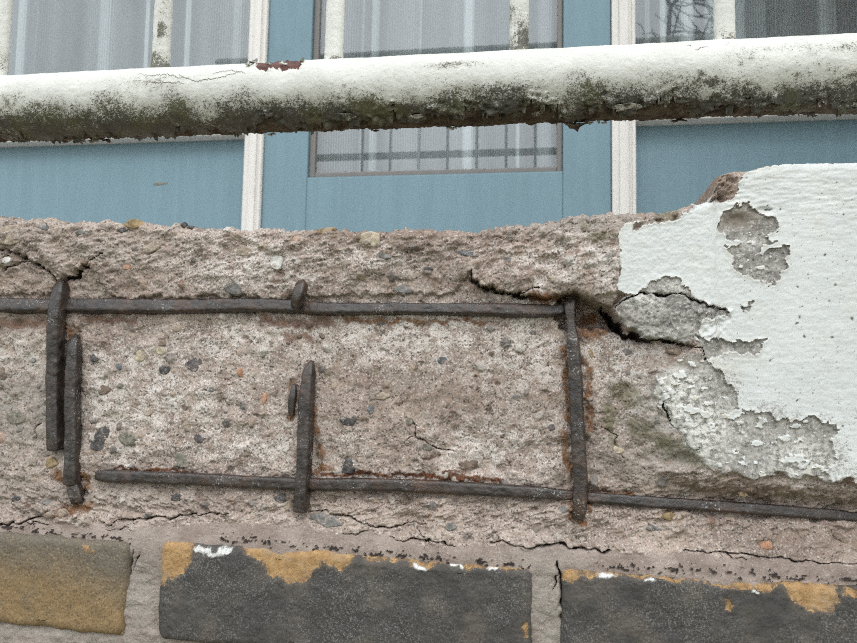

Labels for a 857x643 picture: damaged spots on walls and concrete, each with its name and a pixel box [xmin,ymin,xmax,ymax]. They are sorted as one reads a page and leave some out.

crack [0,248,103,281]
crack [470,271,552,303]
corrosion [531,291,562,304]
corrosion [259,313,486,341]
spalling [0,165,857,567]
corrosion [560,345,573,473]
corrosion [582,357,594,431]
corrosion [313,406,501,483]
crack [0,516,49,526]
crack [104,512,228,530]
crack [316,509,446,544]
crack [684,549,853,564]